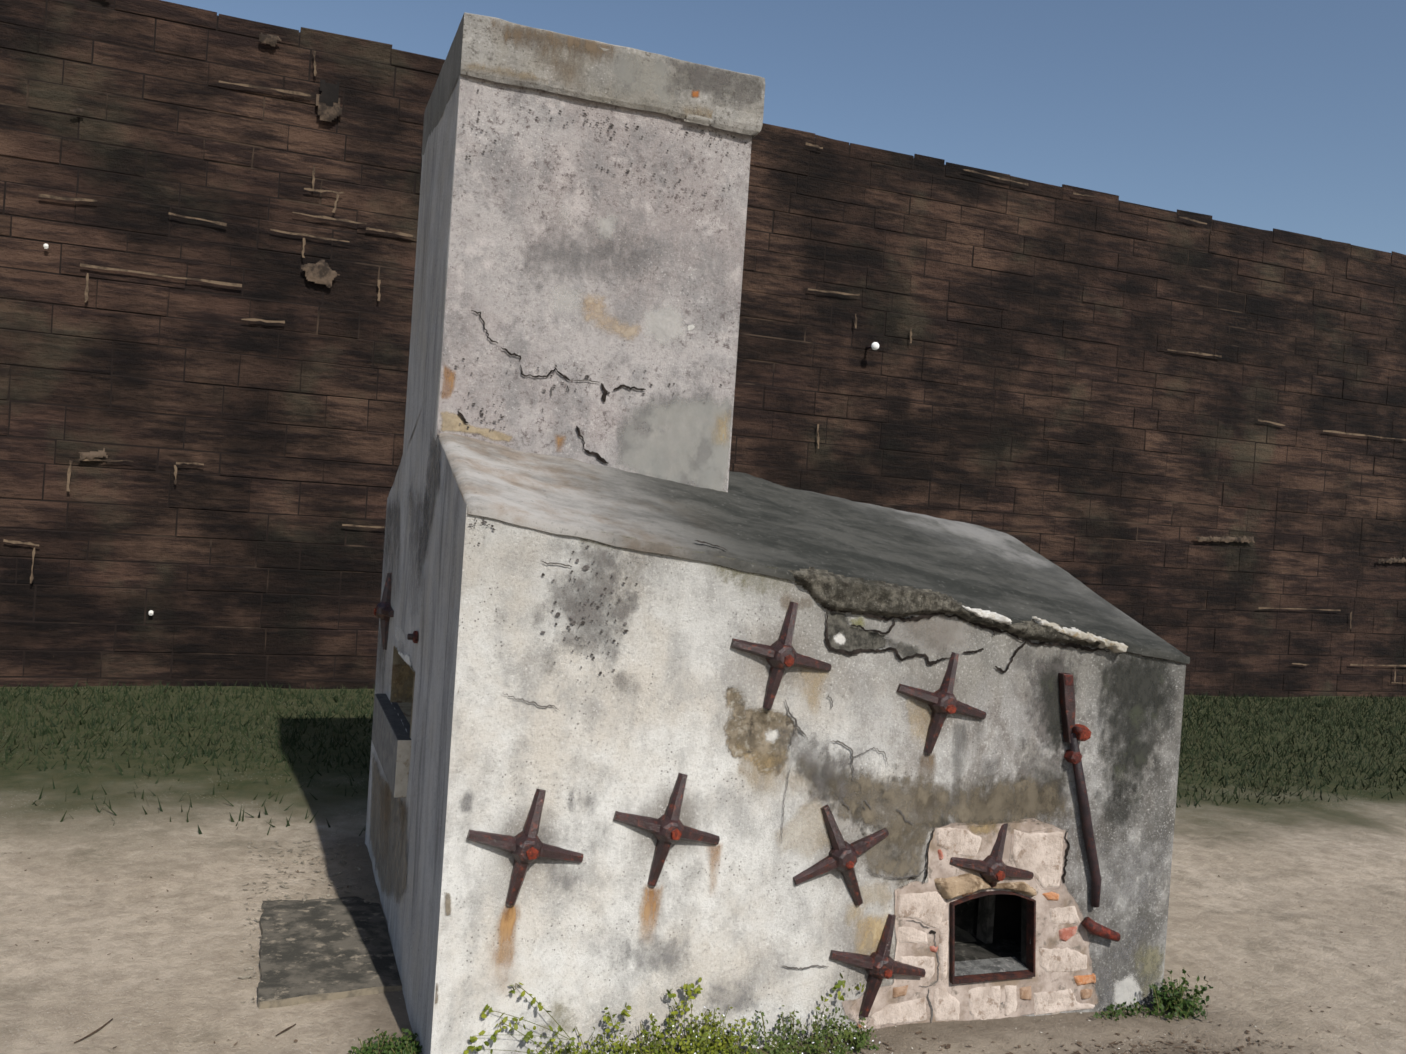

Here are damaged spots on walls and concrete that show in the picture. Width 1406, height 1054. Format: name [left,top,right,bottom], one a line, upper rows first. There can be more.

crack [471,310,646,412]
crack [576,426,608,464]
damp [556,549,647,658]
spalling [788,567,1128,654]
crack [814,596,1110,673]
damp [779,651,1076,883]
damp [1100,642,1171,820]
rust [499,906,516,947]
rust [642,889,657,923]